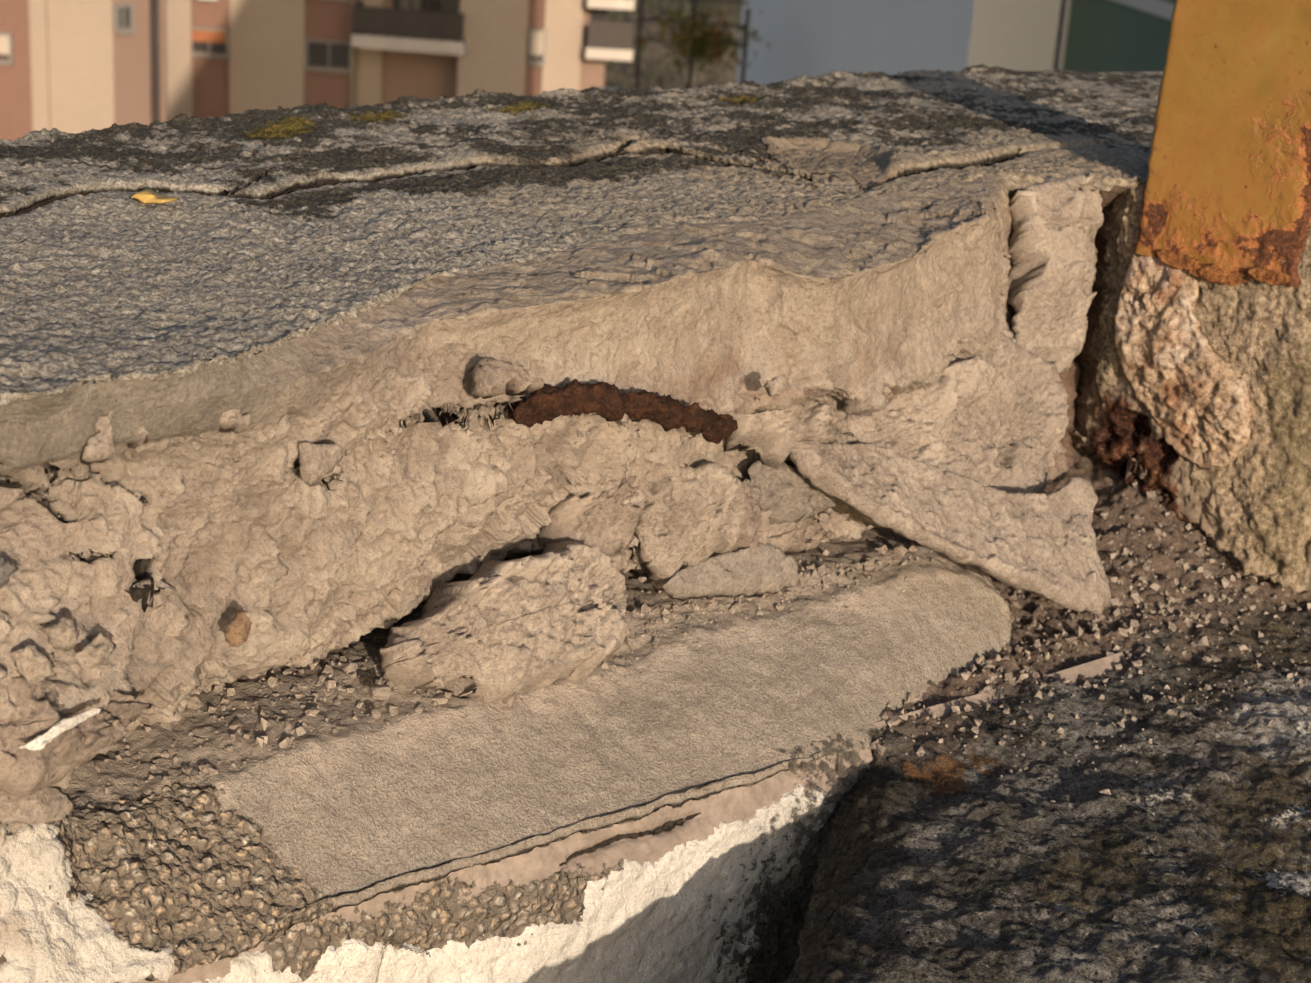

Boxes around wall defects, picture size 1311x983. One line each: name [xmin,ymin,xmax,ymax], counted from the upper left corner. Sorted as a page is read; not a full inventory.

crack [0,140,812,218]
crack [859,125,1022,189]
spalling [0,135,1138,797]
corrosion [508,379,738,444]
corrosion [1090,393,1200,528]
corrosion [903,755,995,794]
peeling [0,782,624,983]
crack [282,770,788,936]
leakage [702,729,935,983]